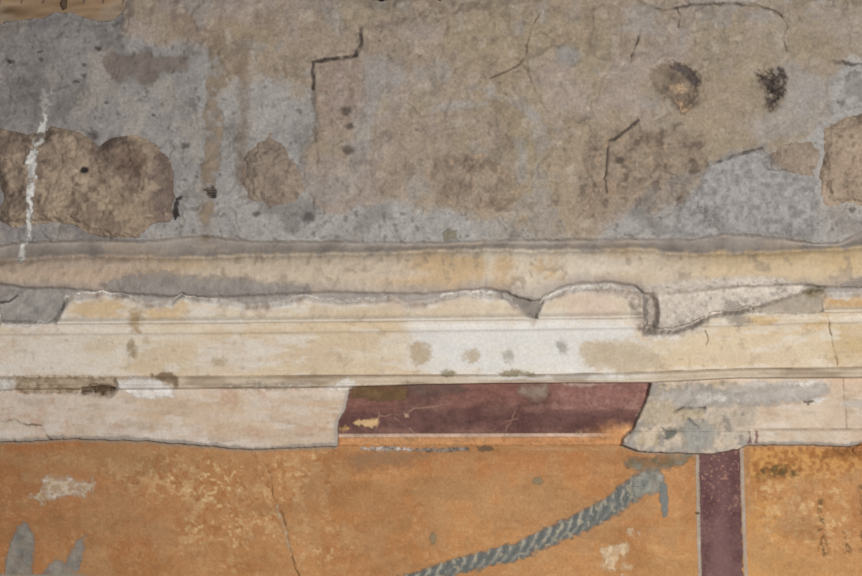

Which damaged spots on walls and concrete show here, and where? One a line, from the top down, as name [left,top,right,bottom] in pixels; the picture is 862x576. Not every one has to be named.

crack [311,34,363,90]
spalling [654,63,698,113]
spalling [757,69,786,106]
crack [604,119,639,192]
spalling [0,288,66,324]
spalling [639,379,829,423]